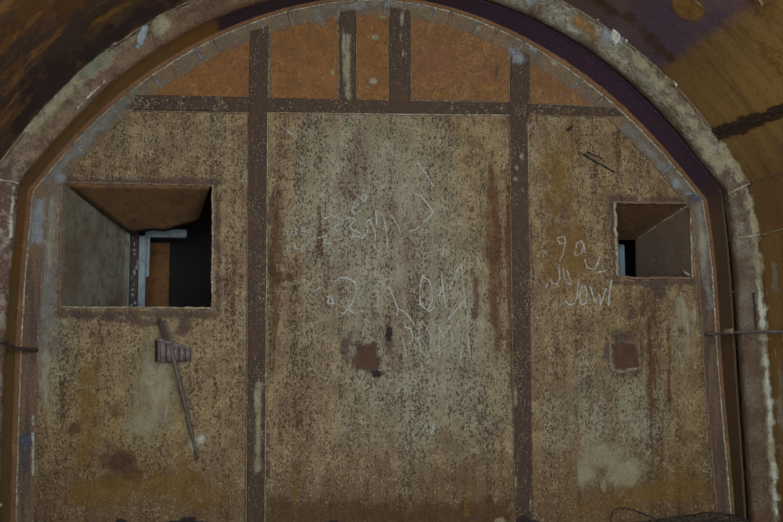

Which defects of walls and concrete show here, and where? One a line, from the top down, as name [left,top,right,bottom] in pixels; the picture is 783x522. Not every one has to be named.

corrosion [341,326,393,377]
corrosion [487,172,512,356]
corrosion [604,301,654,421]
peeling [632,51,783,515]